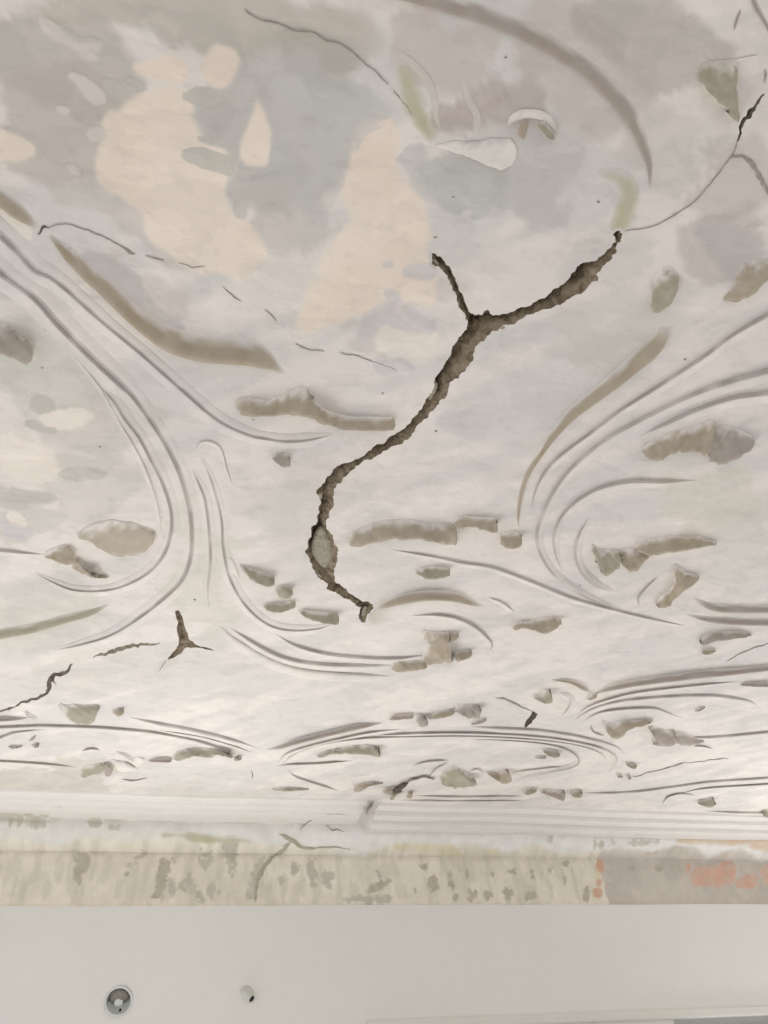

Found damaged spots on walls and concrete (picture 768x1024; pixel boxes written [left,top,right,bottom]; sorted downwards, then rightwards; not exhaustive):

leakage [394,64,438,147]
leakage [596,167,640,233]
crack [38,223,204,268]
peeling [281,117,511,378]
crack [298,71,768,623]
crack [0,664,73,712]
crack [497,698,538,728]
leakage [70,851,92,888]
leakage [122,829,394,906]
crack [254,776,433,902]
leakage [392,838,571,904]